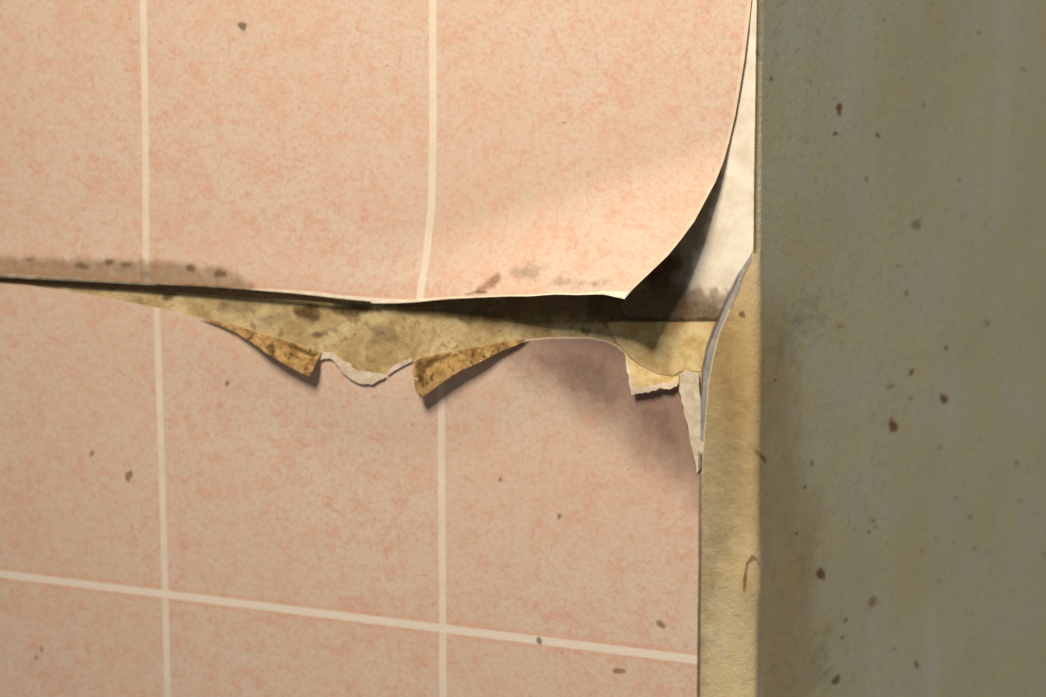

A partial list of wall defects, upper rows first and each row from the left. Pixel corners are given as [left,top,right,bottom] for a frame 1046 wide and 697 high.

flaking render [25,284,716,410]